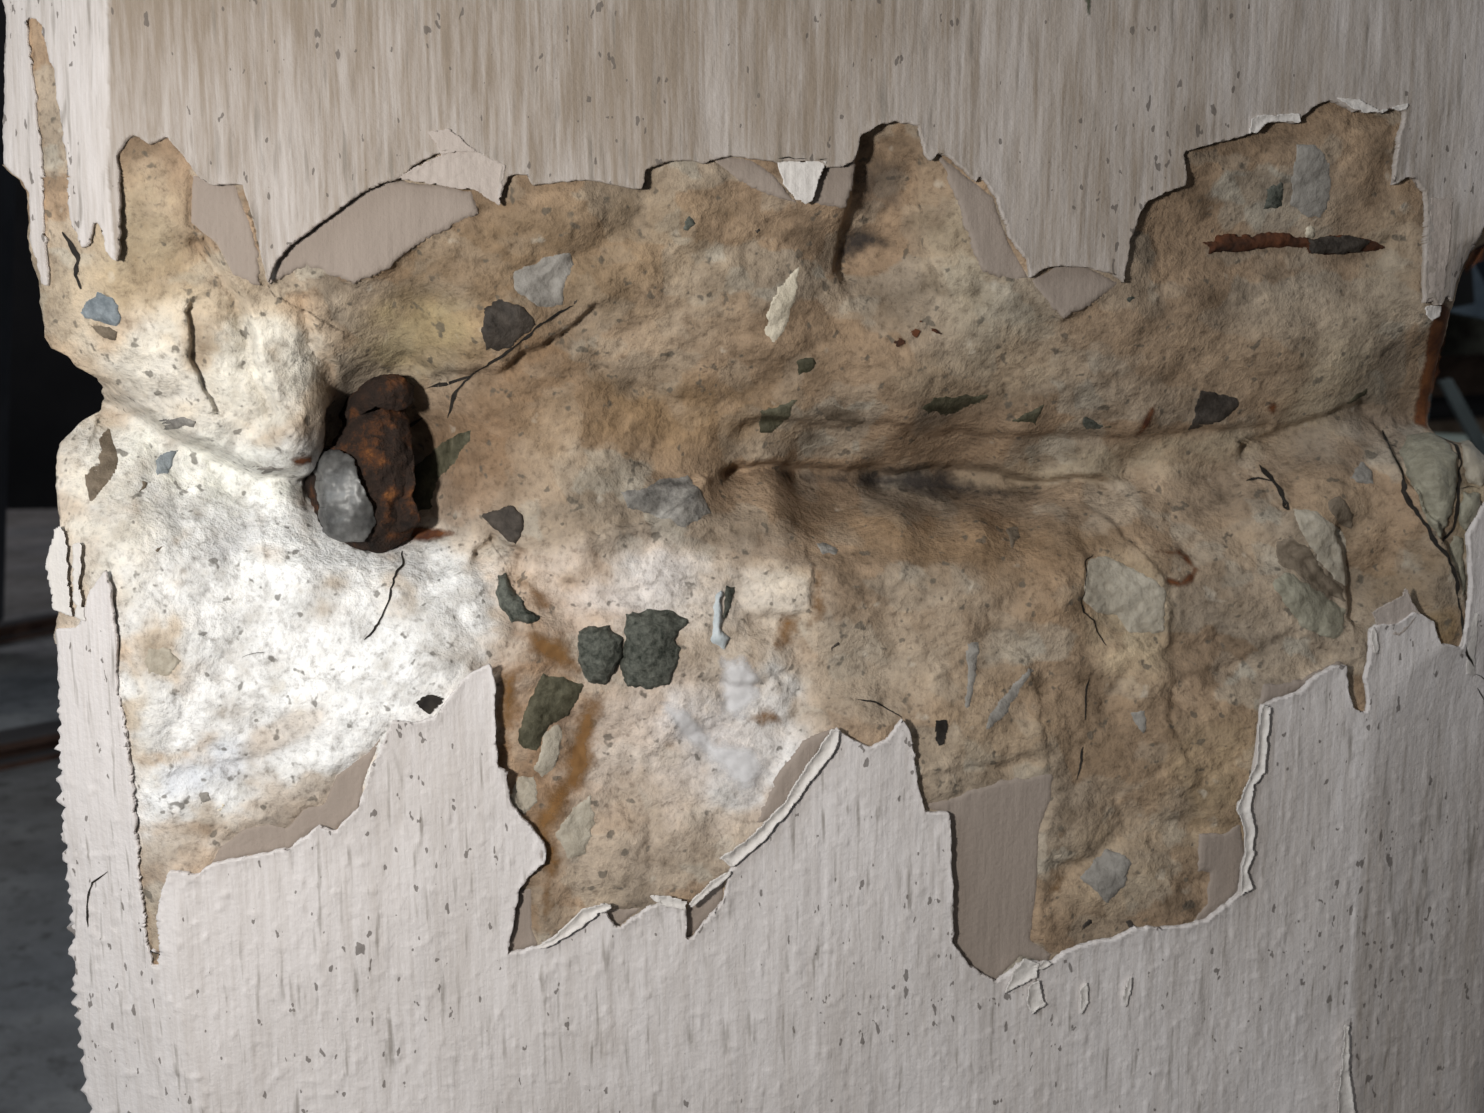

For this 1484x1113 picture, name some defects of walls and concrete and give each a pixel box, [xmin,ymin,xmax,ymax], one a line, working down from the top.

rust [1465,245,1484,271]
crack [410,306,572,427]
rust [1414,304,1450,428]
spalling [3,18,536,964]
spalling [267,98,1484,993]
water stain [831,469,1000,496]
crack [1382,430,1484,700]
peeling [1026,980,1046,1014]